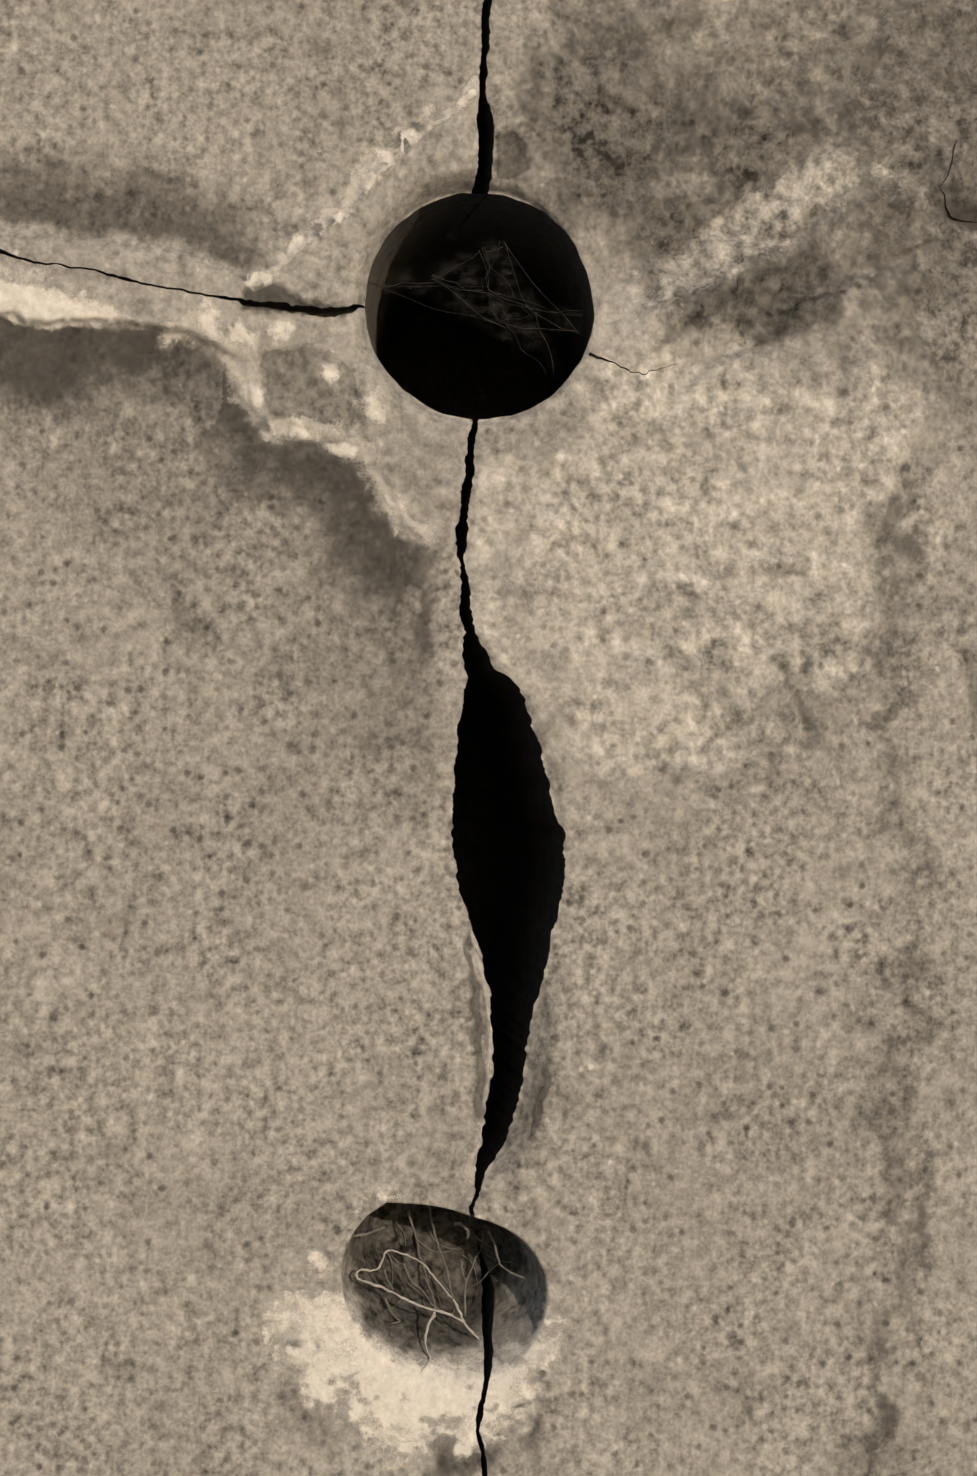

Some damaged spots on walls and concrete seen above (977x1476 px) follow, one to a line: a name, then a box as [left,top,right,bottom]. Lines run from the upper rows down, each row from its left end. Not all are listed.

crack [0,249,364,318]
damp [0,265,437,589]
crack [445,0,495,239]
crack [589,352,678,375]
spalling [463,0,977,800]
crack [937,141,977,228]
crack [451,421,566,1476]
damp [262,1249,567,1475]
spalling [345,1202,527,1349]